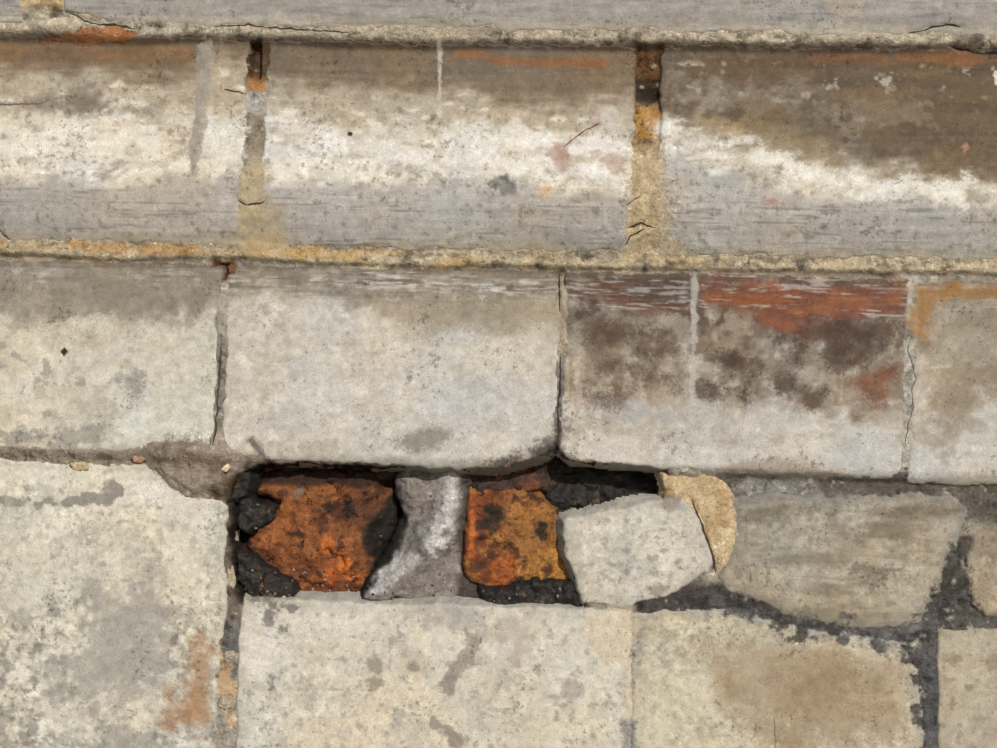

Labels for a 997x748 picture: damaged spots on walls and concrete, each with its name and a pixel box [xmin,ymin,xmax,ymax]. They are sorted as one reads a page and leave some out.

leakage [642,40,997,219]
leakage [292,263,913,346]
leakage [686,342,699,446]
corrosion [567,265,997,354]
corrosion [841,354,907,418]
crack [905,338,917,445]
leakage [908,291,997,445]
spalling [246,468,402,593]
spalling [462,486,713,605]
corrosion [151,624,231,746]
leakage [665,621,933,748]